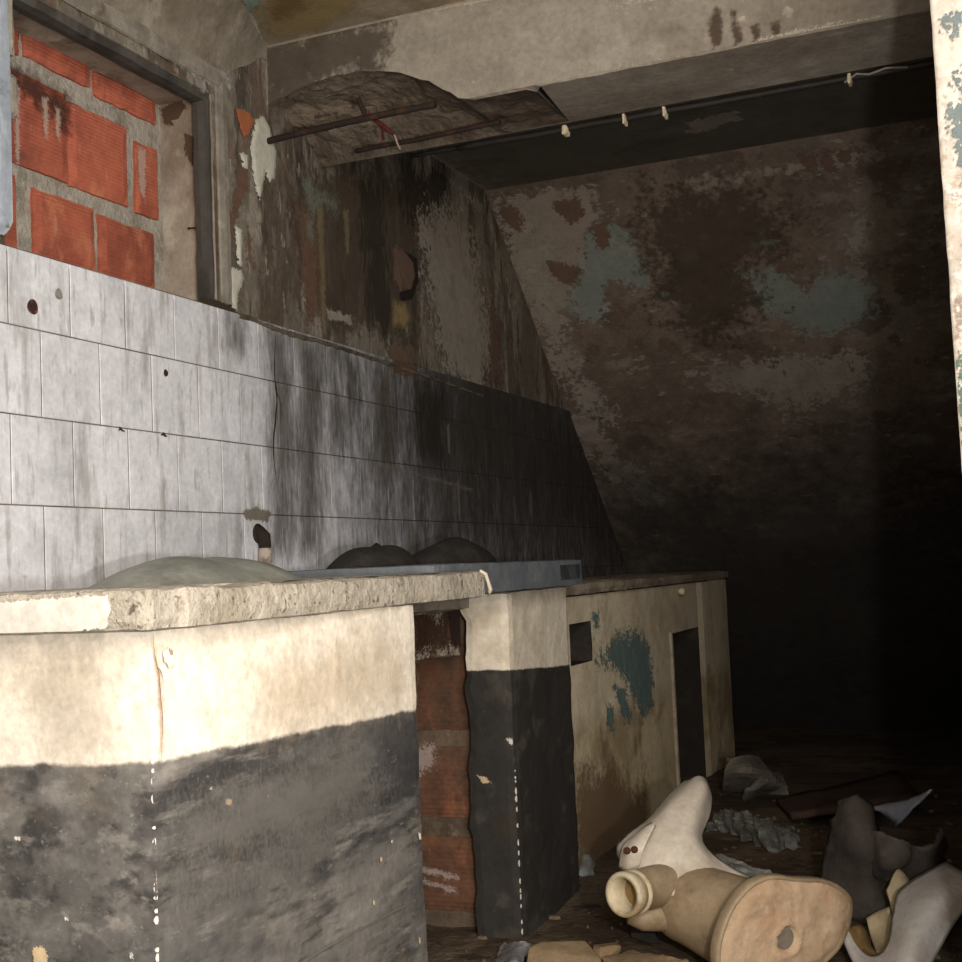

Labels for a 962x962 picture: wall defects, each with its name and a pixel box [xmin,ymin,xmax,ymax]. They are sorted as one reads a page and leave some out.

peeling [938,10,962,42]
peeling [0,0,18,235]
spalling [236,71,505,201]
peeling [943,64,962,167]
water stain [290,152,621,432]
water stain [626,176,795,349]
peeling [954,294,962,431]
water stain [302,342,320,545]
crack [153,636,164,759]
peeling [592,609,655,736]